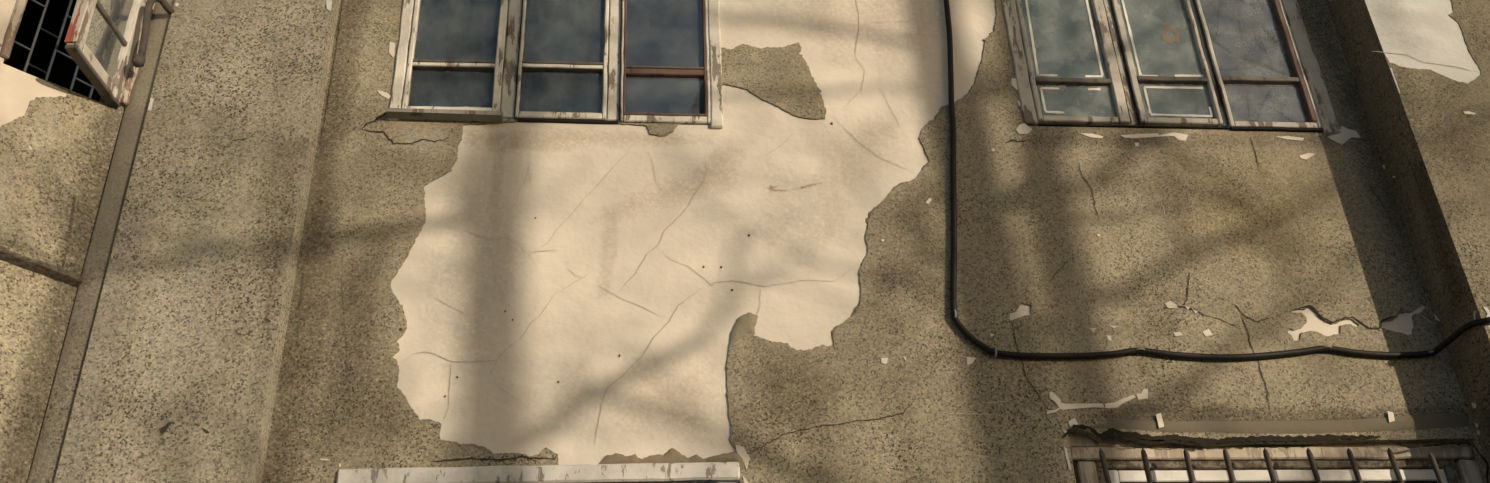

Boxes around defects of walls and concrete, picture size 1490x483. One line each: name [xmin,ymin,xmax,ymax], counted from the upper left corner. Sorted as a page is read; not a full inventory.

peeling [1365,0,1481,93]
peeling [0,0,68,127]
spalling [1121,132,1188,146]
spalling [1276,136,1315,160]
peeling [1327,126,1361,145]
peeling [391,0,997,483]
crack [408,147,856,445]
peeling [1287,308,1359,341]
peeling [1381,304,1440,335]
peeling [1047,389,1164,470]
crack [435,455,556,463]